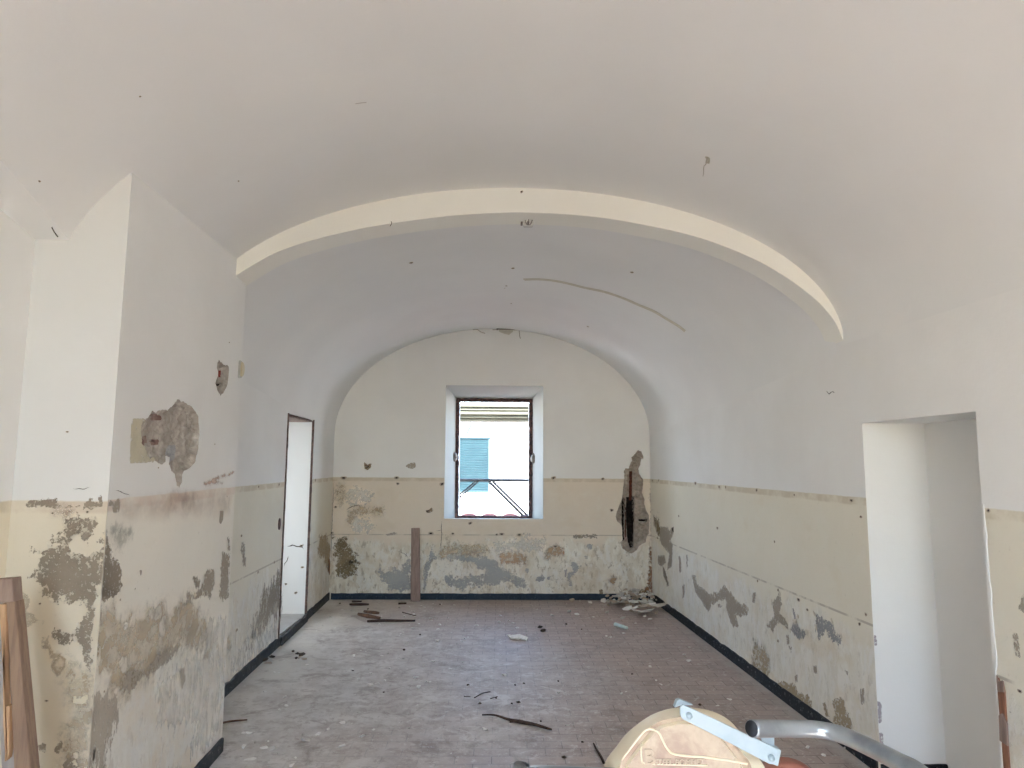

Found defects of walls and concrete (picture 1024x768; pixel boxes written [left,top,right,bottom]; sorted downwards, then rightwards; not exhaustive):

spalling [215,361,229,396]
spalling [141,399,199,488]
peeling [26,495,123,672]
damp [97,598,207,691]
peeling [658,526,756,628]
peeling [767,591,842,650]